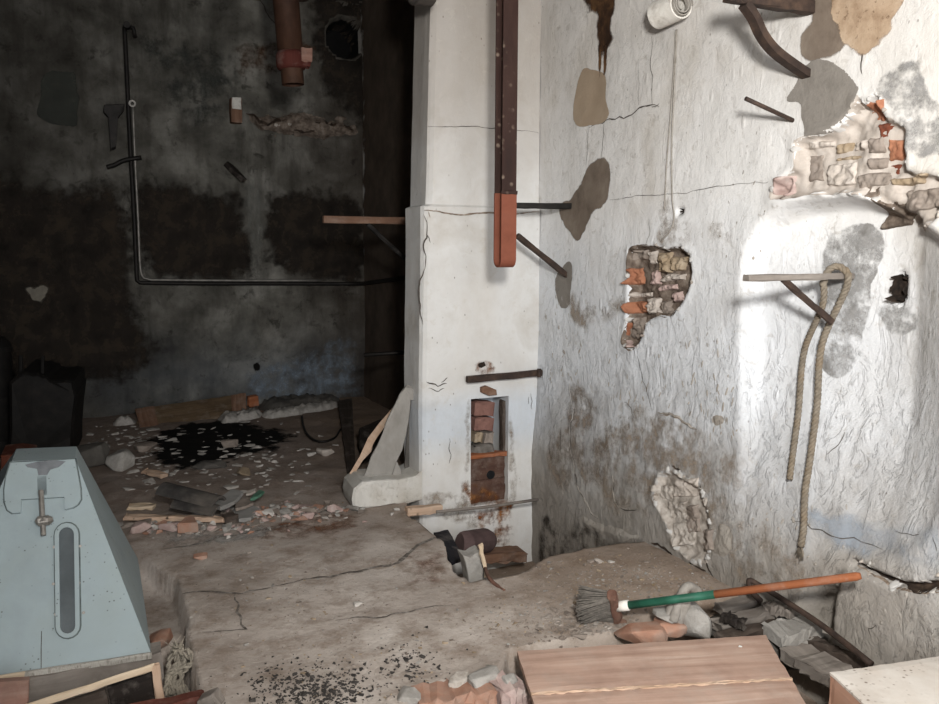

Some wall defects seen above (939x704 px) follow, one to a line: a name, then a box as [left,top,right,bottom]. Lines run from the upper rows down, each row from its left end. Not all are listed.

flaking render [246,112,358,140]
flaking render [573,68,609,127]
flaking render [559,158,610,241]
damp [0,180,364,383]
flaking render [608,243,693,363]
flaking render [816,346,852,376]
crack [183,537,450,632]
flaking render [650,466,714,567]
crack [795,521,939,594]